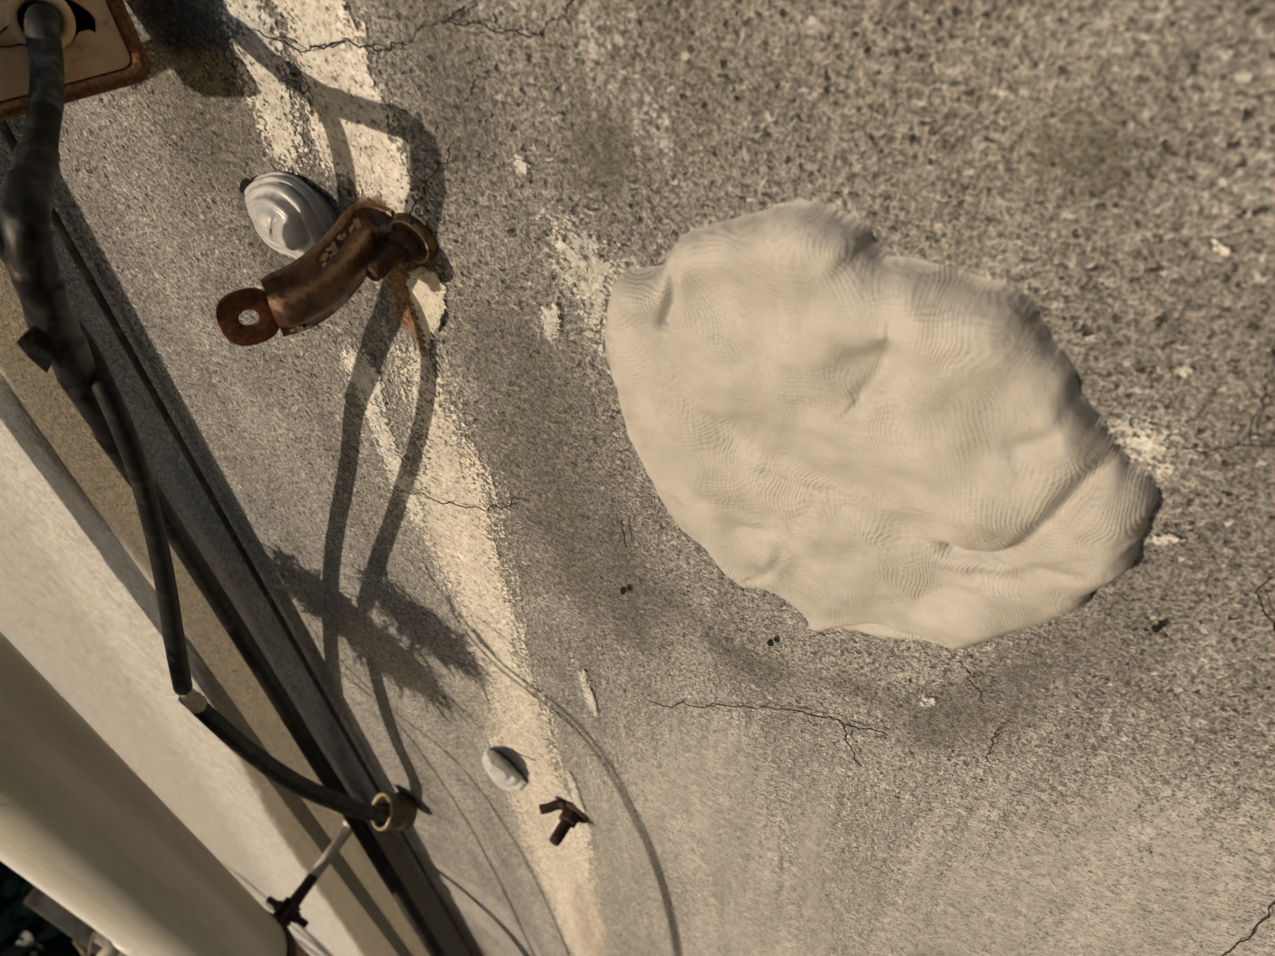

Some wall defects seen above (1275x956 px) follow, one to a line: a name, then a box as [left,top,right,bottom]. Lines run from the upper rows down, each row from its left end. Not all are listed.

crack [246,0,575,53]
crack [409,140,454,224]
rust [383,262,437,353]
crack [1182,341,1275,453]
crack [1255,571,1275,633]
crack [649,700,888,767]
crack [959,661,1003,762]
crack [1221,903,1275,956]